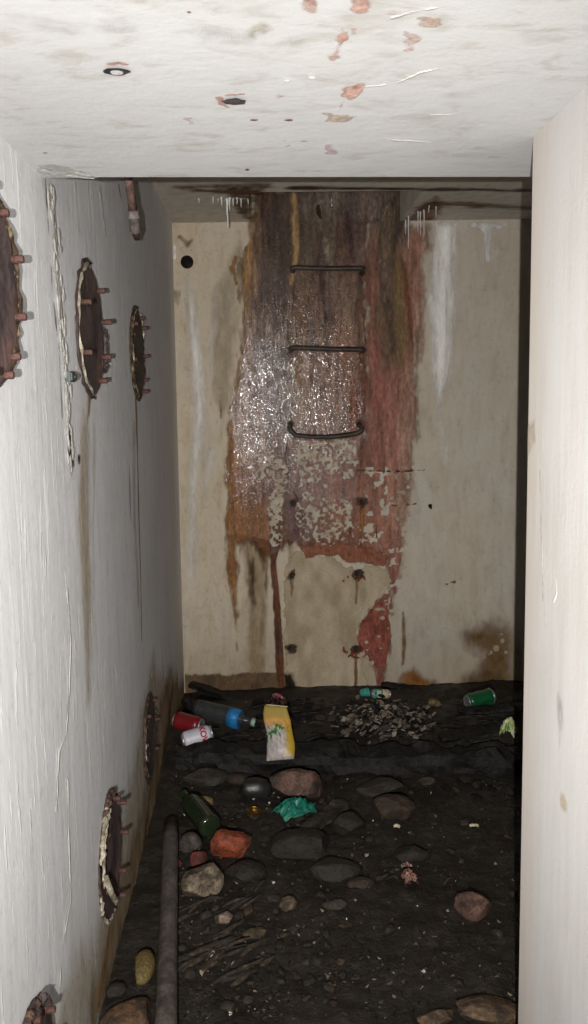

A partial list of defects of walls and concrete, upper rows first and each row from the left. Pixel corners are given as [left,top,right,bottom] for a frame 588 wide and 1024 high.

rust [177,184,269,219]
leakage [429,223,456,398]
rust [287,186,532,686]
peeling [250,438,392,687]
leakage [464,626,510,683]
rust [64,668,183,1024]